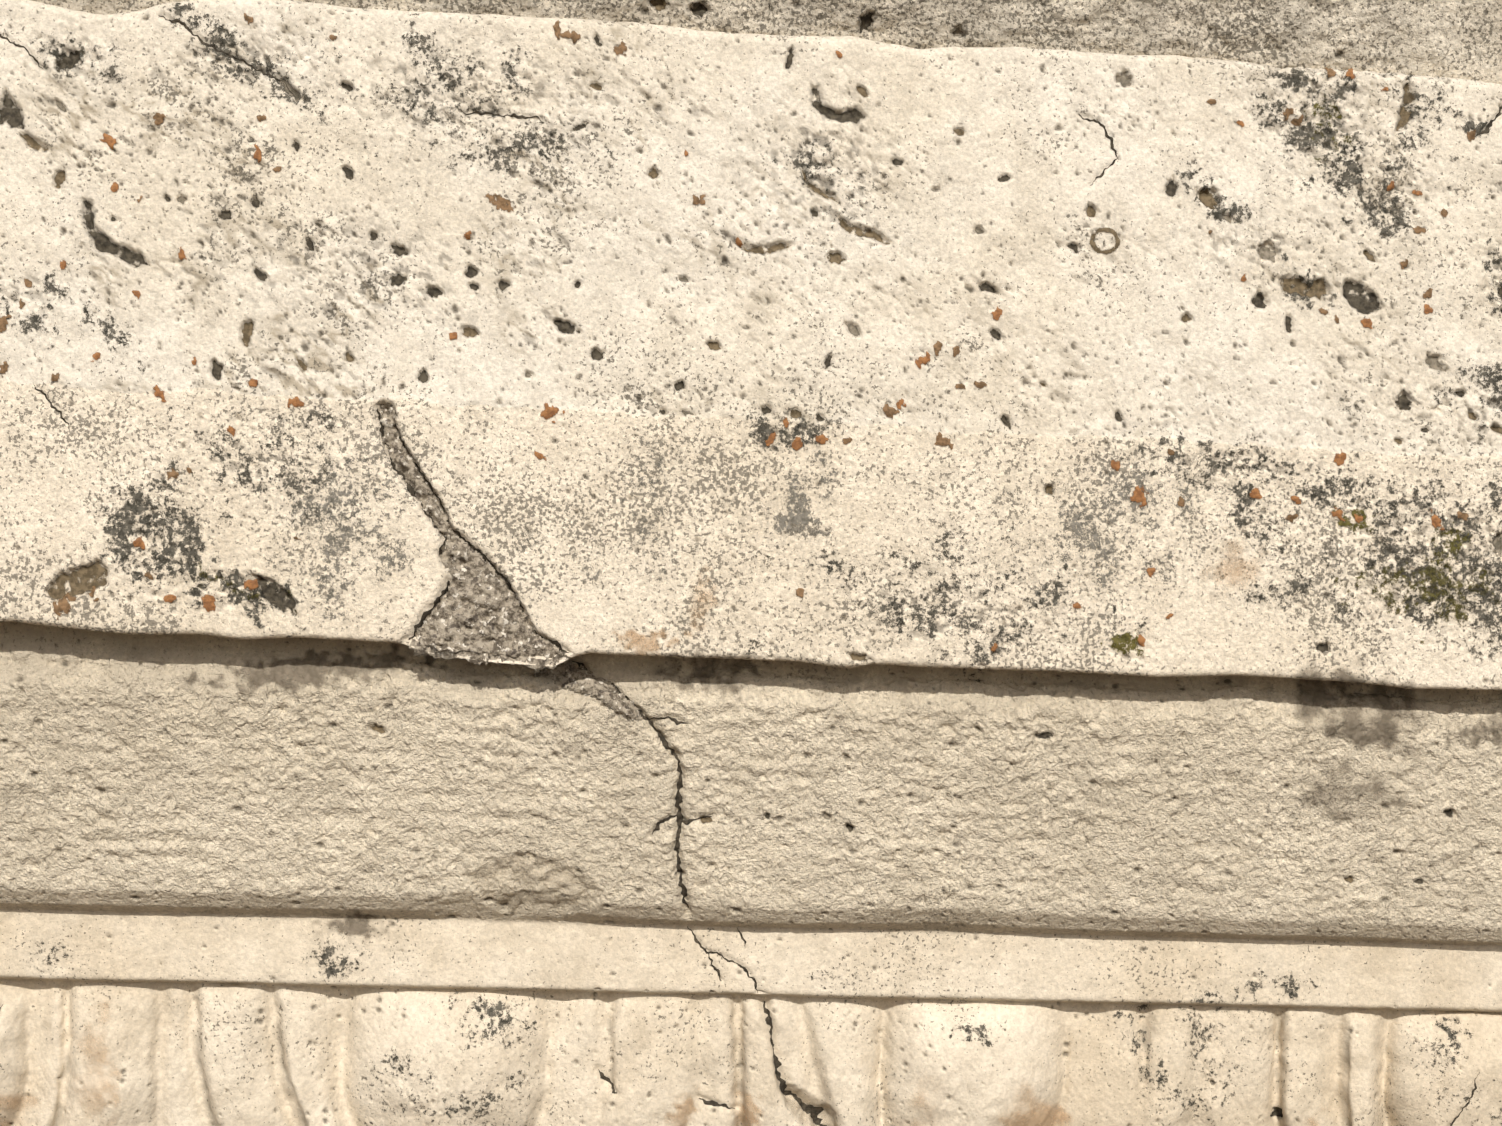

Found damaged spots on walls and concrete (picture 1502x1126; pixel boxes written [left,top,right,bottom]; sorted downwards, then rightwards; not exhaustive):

crack [377,404,827,1126]
crack [1450,1072,1480,1126]